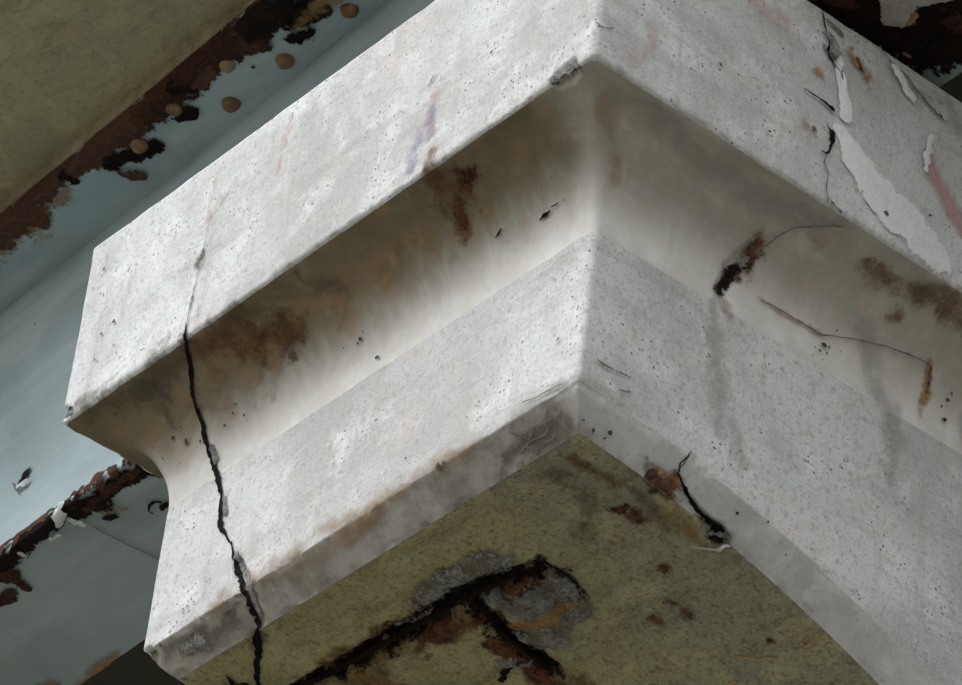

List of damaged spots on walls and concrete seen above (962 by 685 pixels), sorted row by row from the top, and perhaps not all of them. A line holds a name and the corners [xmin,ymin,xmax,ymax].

corrosion [0,0,343,256]
corrosion [407,105,478,241]
spalling [804,10,953,278]
corrosion [0,458,161,607]
corrosion [148,501,169,514]
crack [171,271,263,685]
spalling [290,551,596,685]